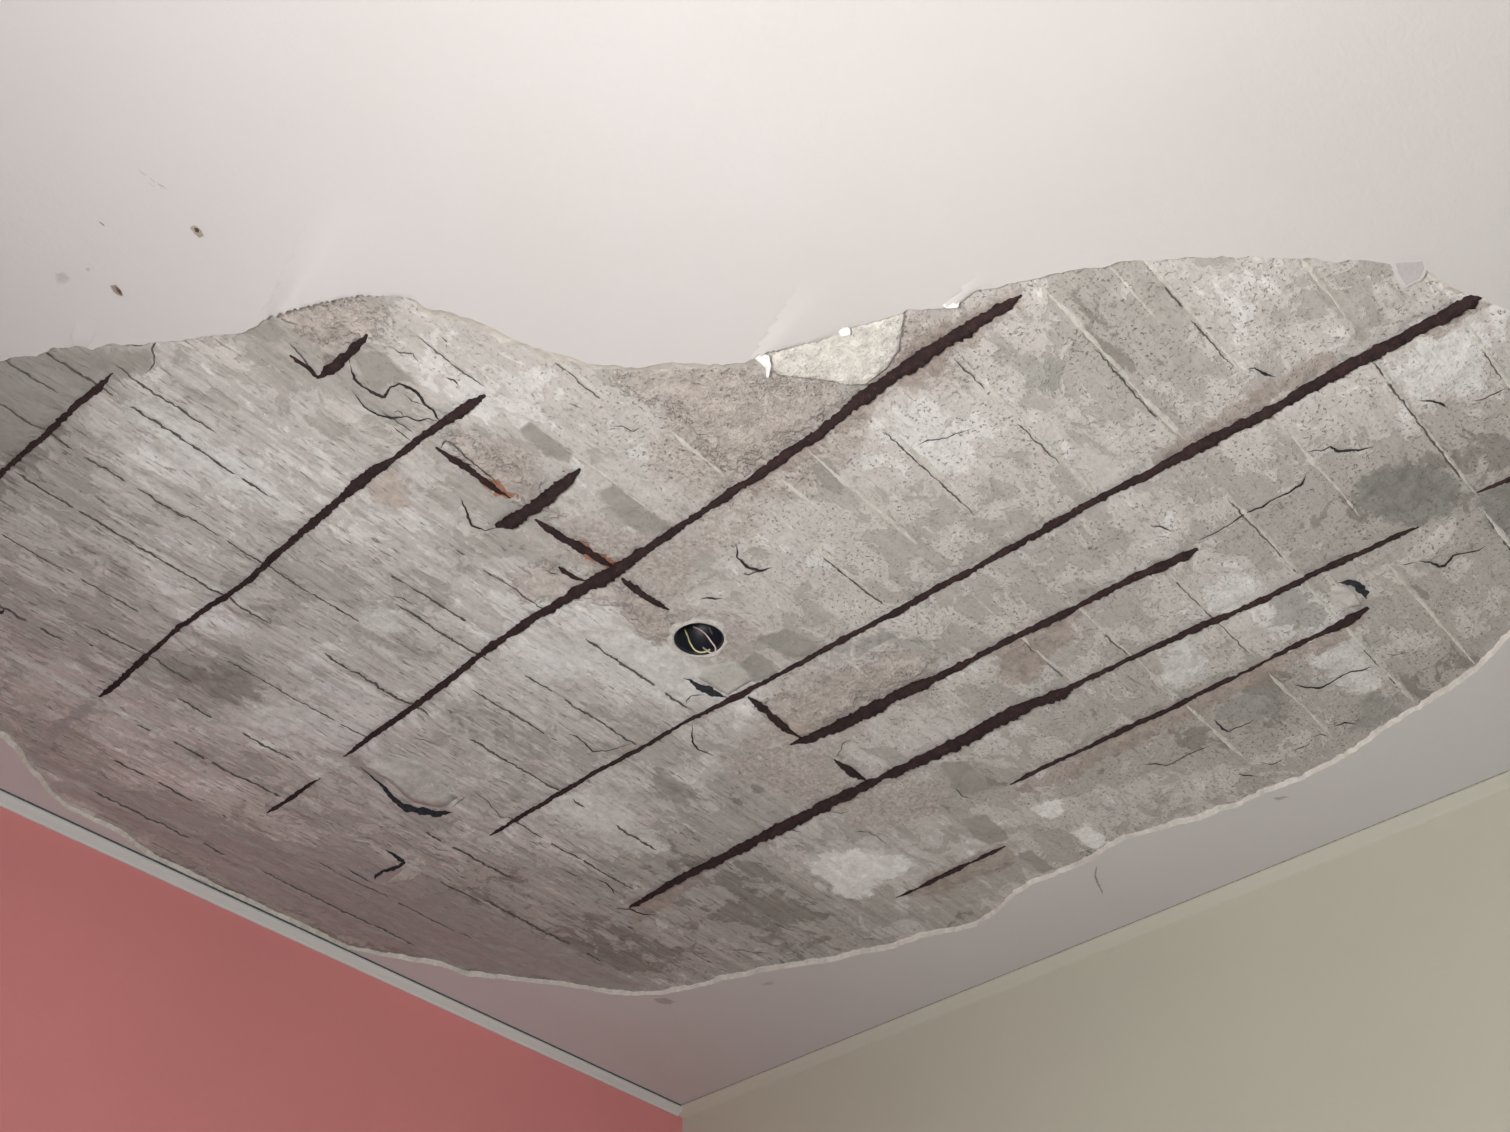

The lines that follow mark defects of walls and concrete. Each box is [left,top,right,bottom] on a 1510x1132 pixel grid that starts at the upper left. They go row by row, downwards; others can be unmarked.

crack [289,338,496,531]
rust [698,280,1039,525]
rust [360,465,417,512]
rust [474,474,520,502]
rust [566,535,621,571]
spalling [0,256,1510,996]
rust [976,597,1097,695]
rust [772,710,824,745]
rust [1008,609,1373,794]
rust [625,856,724,924]
rust [900,842,1020,902]